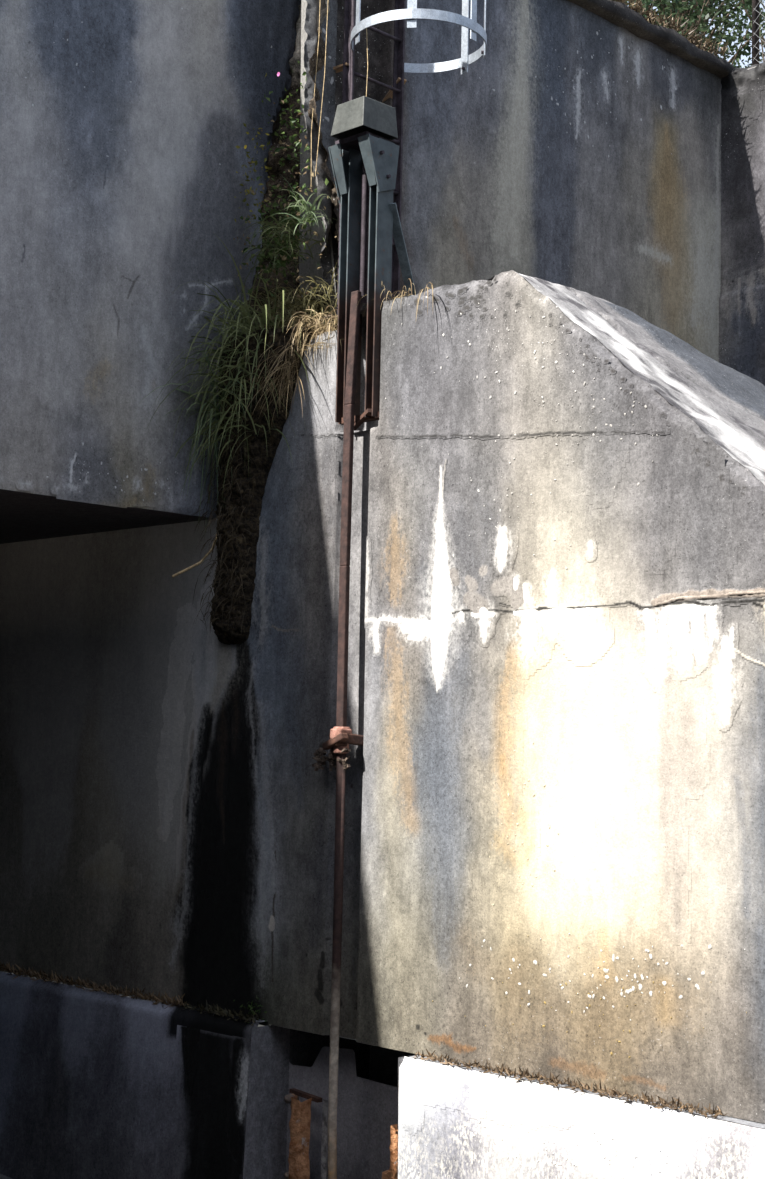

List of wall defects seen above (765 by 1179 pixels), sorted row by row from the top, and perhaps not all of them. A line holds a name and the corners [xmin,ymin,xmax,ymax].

crack [451,589,765,615]
water stain [155,433,341,1027]
water stain [364,463,615,982]
water stain [351,808,362,986]
water stain [175,1025,251,1179]
water stain [401,1078,618,1141]